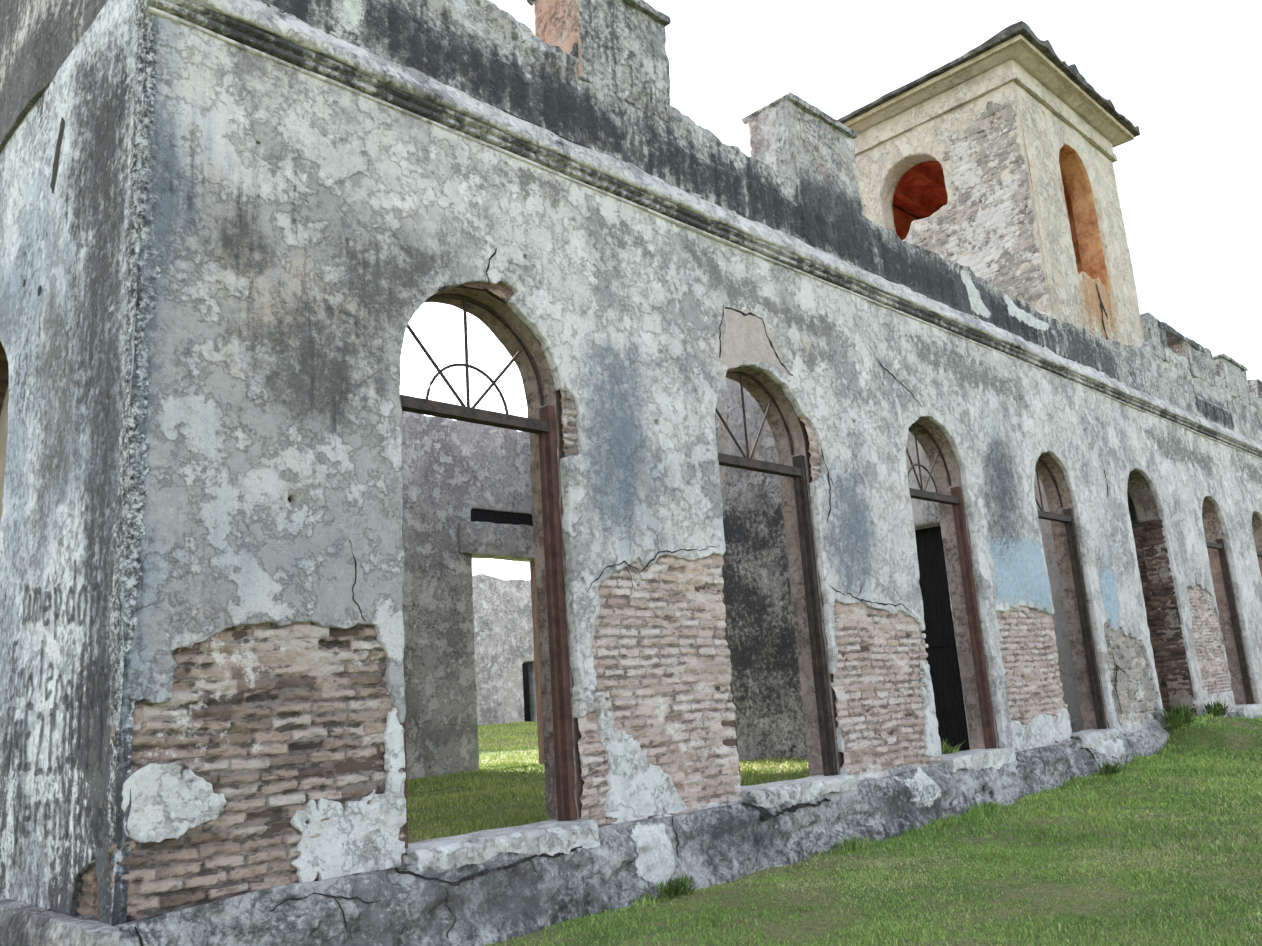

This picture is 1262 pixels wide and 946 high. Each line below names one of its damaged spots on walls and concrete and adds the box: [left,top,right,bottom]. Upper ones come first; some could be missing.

damp [334,0,526,106]
damp [542,65,624,152]
damp [643,109,958,305]
peeling [683,241,855,374]
damp [37,37,194,726]
spalling [76,0,408,923]
crack [587,541,720,604]
spalling [578,554,743,890]
spalling [831,601,942,808]
spalling [996,605,1074,751]
crack [270,893,381,931]
crack [395,846,582,939]